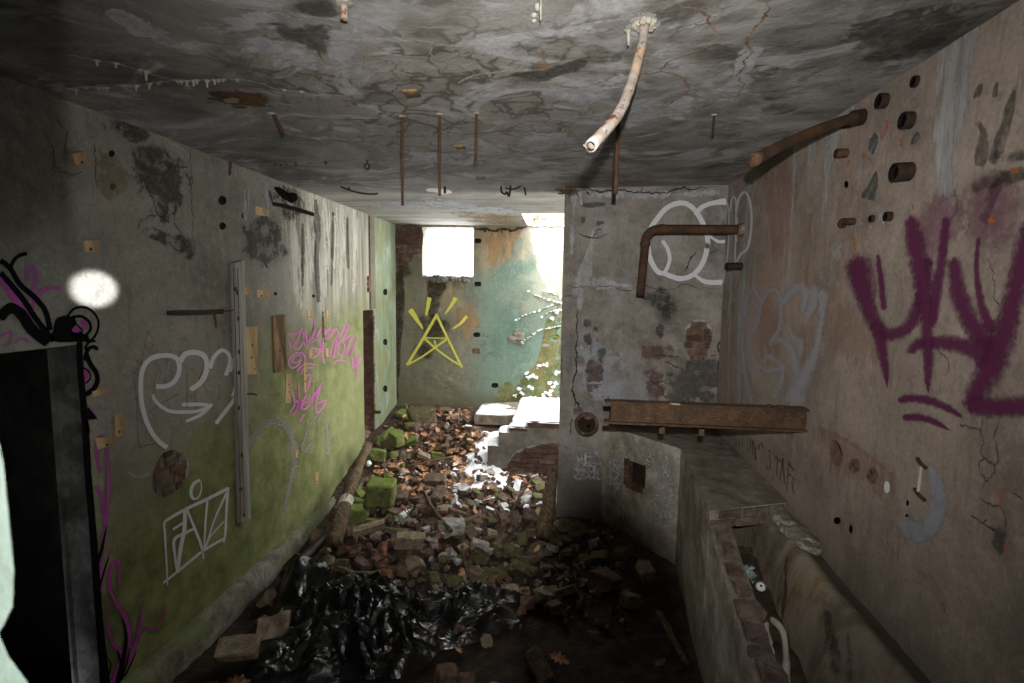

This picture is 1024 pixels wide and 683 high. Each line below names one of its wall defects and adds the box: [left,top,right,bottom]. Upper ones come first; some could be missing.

crack [388,27,512,84]
crack [597,1,829,109]
damp [104,120,193,260]
damp [235,165,528,310]
flaking render [395,225,423,265]
crack [564,250,722,434]
peeling [573,319,713,413]
flaking render [124,450,189,497]
crack [960,416,1023,534]